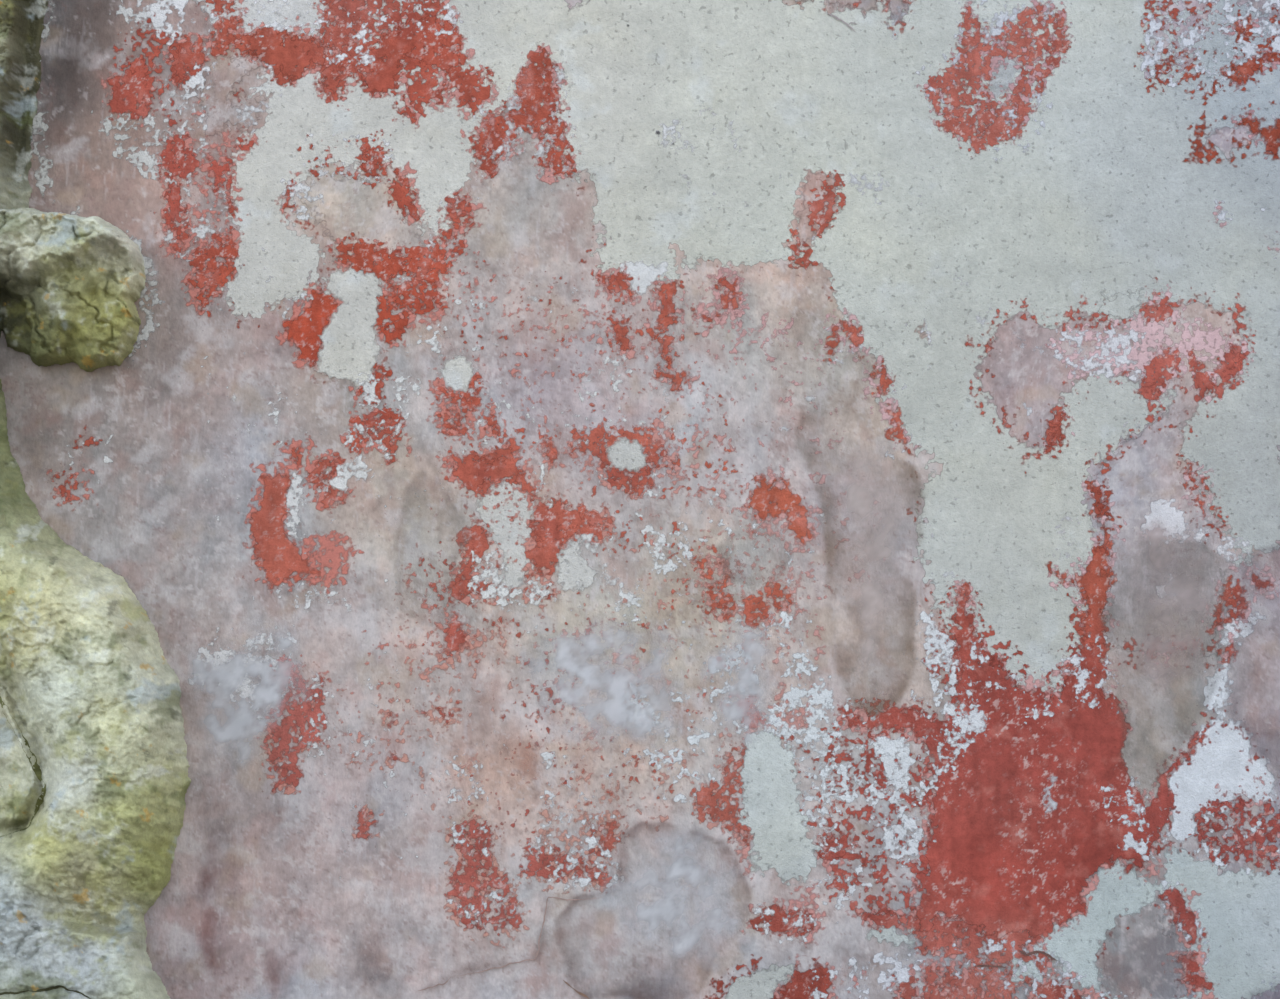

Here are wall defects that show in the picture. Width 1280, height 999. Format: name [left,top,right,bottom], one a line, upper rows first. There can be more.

spalling [30,102,55,201]
spalling [126,230,165,357]
flaking render [564,405,738,511]
peeling [534,618,606,673]
peeling [188,625,472,796]
peeling [505,668,613,769]
peeling [350,805,383,840]
crack [418,897,601,991]
peeling [442,763,639,948]
leakage [636,842,721,953]
peeling [706,954,869,999]